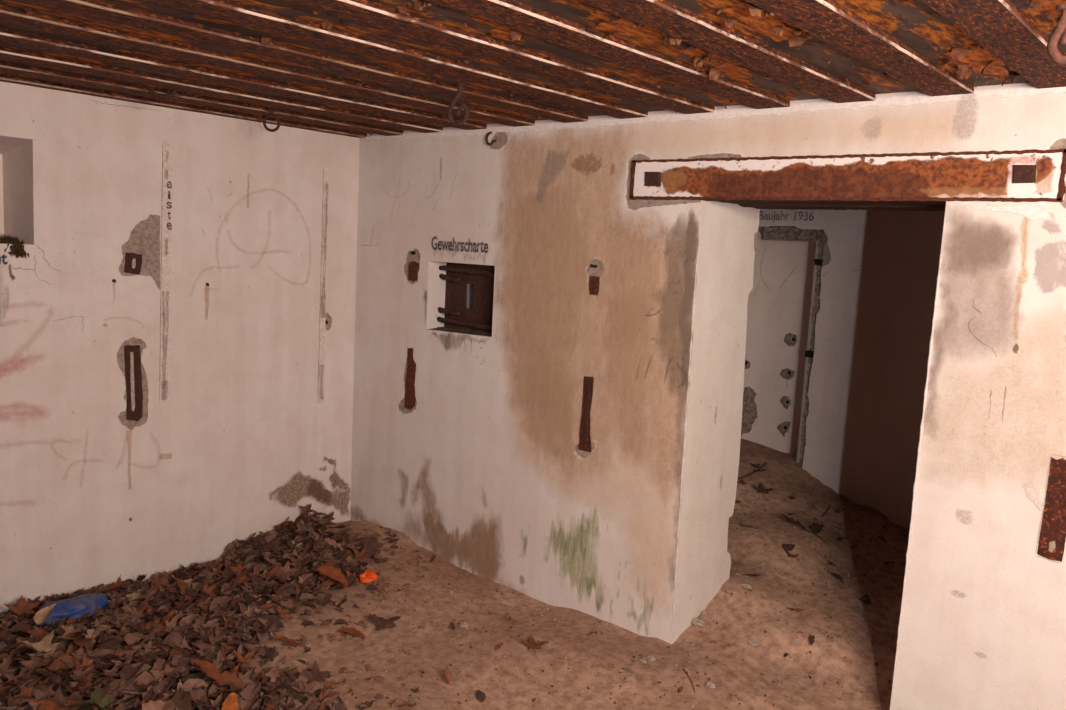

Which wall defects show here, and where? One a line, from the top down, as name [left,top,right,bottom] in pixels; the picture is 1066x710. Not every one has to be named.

corrosion [481,26,525,44]
corrosion [593,7,754,81]
corrosion [717,1,809,47]
corrosion [931,44,1030,87]
flaking render [1050,138,1066,150]
corrosion [661,156,1053,201]
flaking render [119,214,167,291]
damp [501,140,697,481]
flaking render [117,337,149,430]
spalling [741,387,758,435]